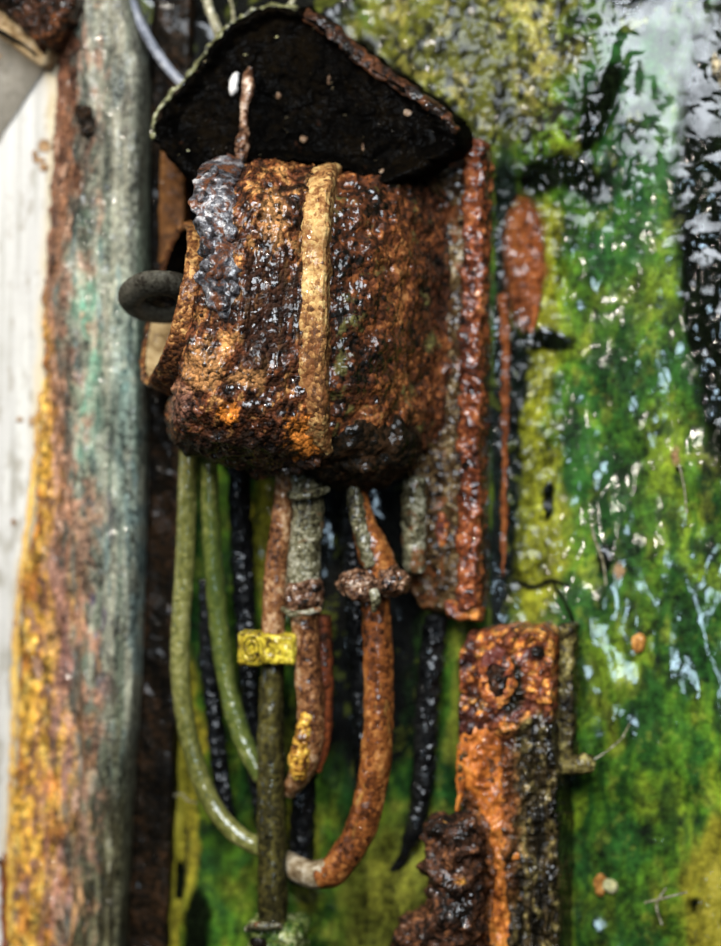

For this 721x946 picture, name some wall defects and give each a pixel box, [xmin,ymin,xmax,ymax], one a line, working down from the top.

leakage [616,0,636,9]
leakage [519,61,622,194]
leakage [676,14,721,467]
rust [497,195,546,575]
leakage [522,327,574,352]
rust [0,0,87,946]
leakage [543,481,555,521]
rust [288,712,312,781]
rust [455,724,520,946]
leakage [698,862,721,946]